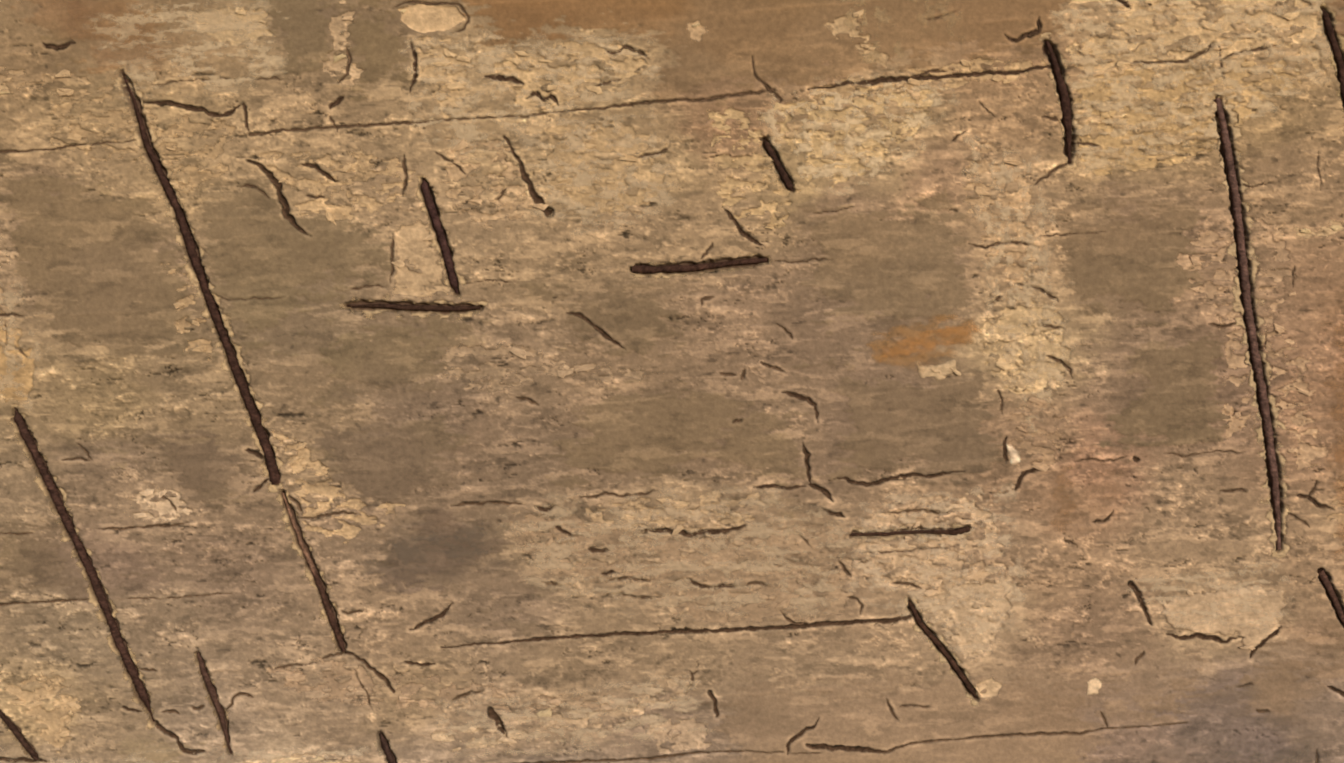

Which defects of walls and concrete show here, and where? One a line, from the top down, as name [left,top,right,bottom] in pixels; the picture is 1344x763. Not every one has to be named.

spalling [322,0,364,90]
peeling [398,4,477,119]
spalling [687,20,708,42]
crack [143,19,1051,236]
spalling [631,253,771,279]
peeling [707,0,1344,558]
spalling [0,41,712,763]
crack [100,496,187,530]
crack [245,449,361,519]
crack [272,323,965,717]
crack [121,693,253,755]
crack [450,690,1187,763]